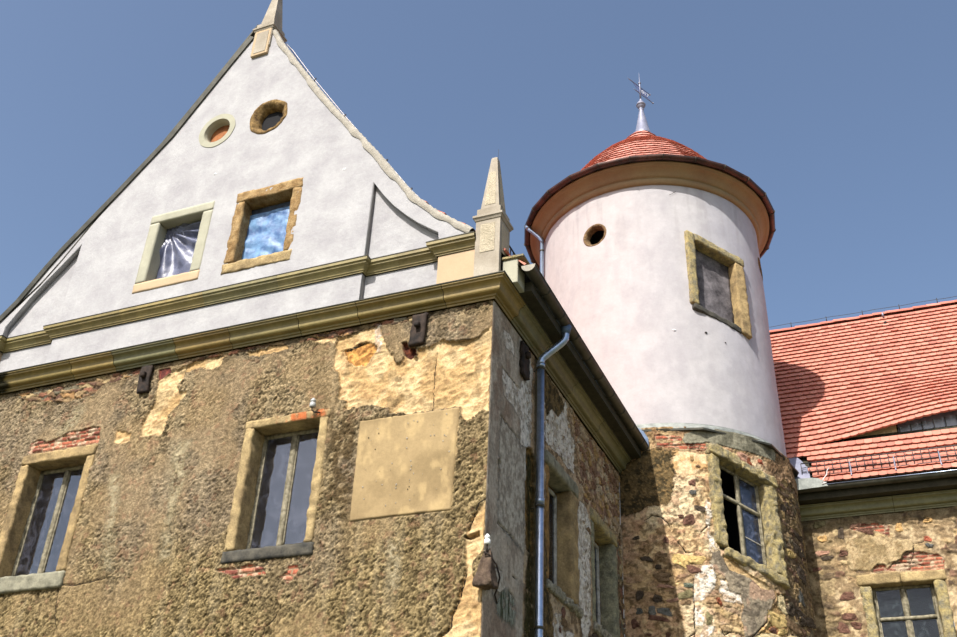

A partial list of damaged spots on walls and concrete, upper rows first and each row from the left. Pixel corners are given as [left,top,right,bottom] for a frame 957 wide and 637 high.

spalling [11,368,141,402]
flaking render [114,316,492,444]
flaking render [28,427,101,454]
peeling [502,358,534,555]
flaking render [872,536,945,573]